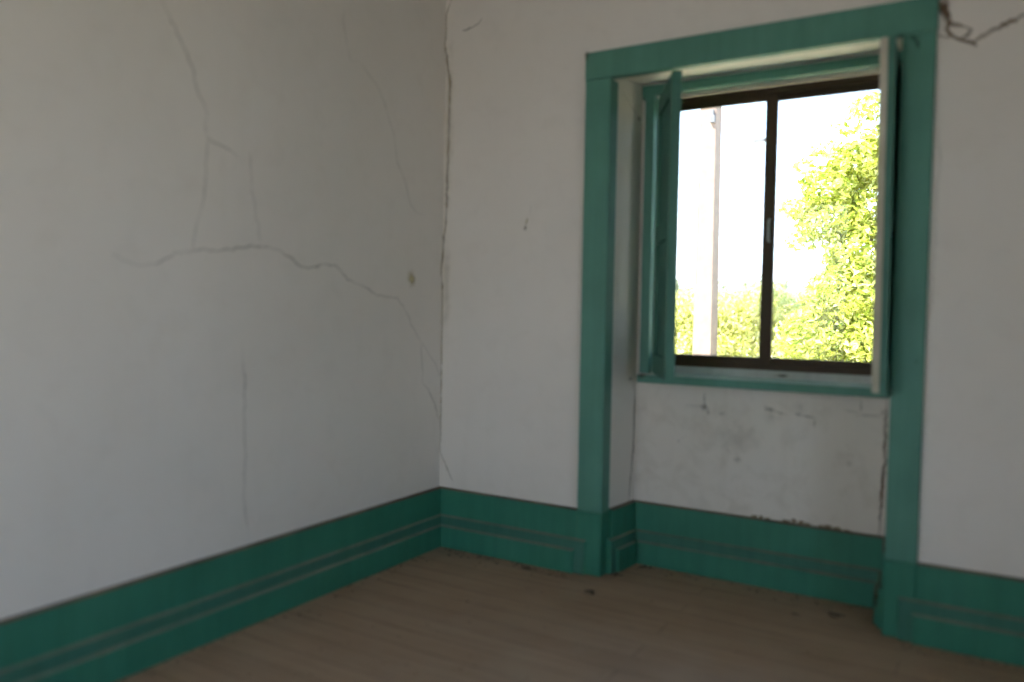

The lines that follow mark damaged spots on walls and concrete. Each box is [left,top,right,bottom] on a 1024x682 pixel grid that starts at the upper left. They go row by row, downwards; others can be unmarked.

crack [938,1,1024,47]
crack [440,5,477,477]
crack [879,415,887,531]